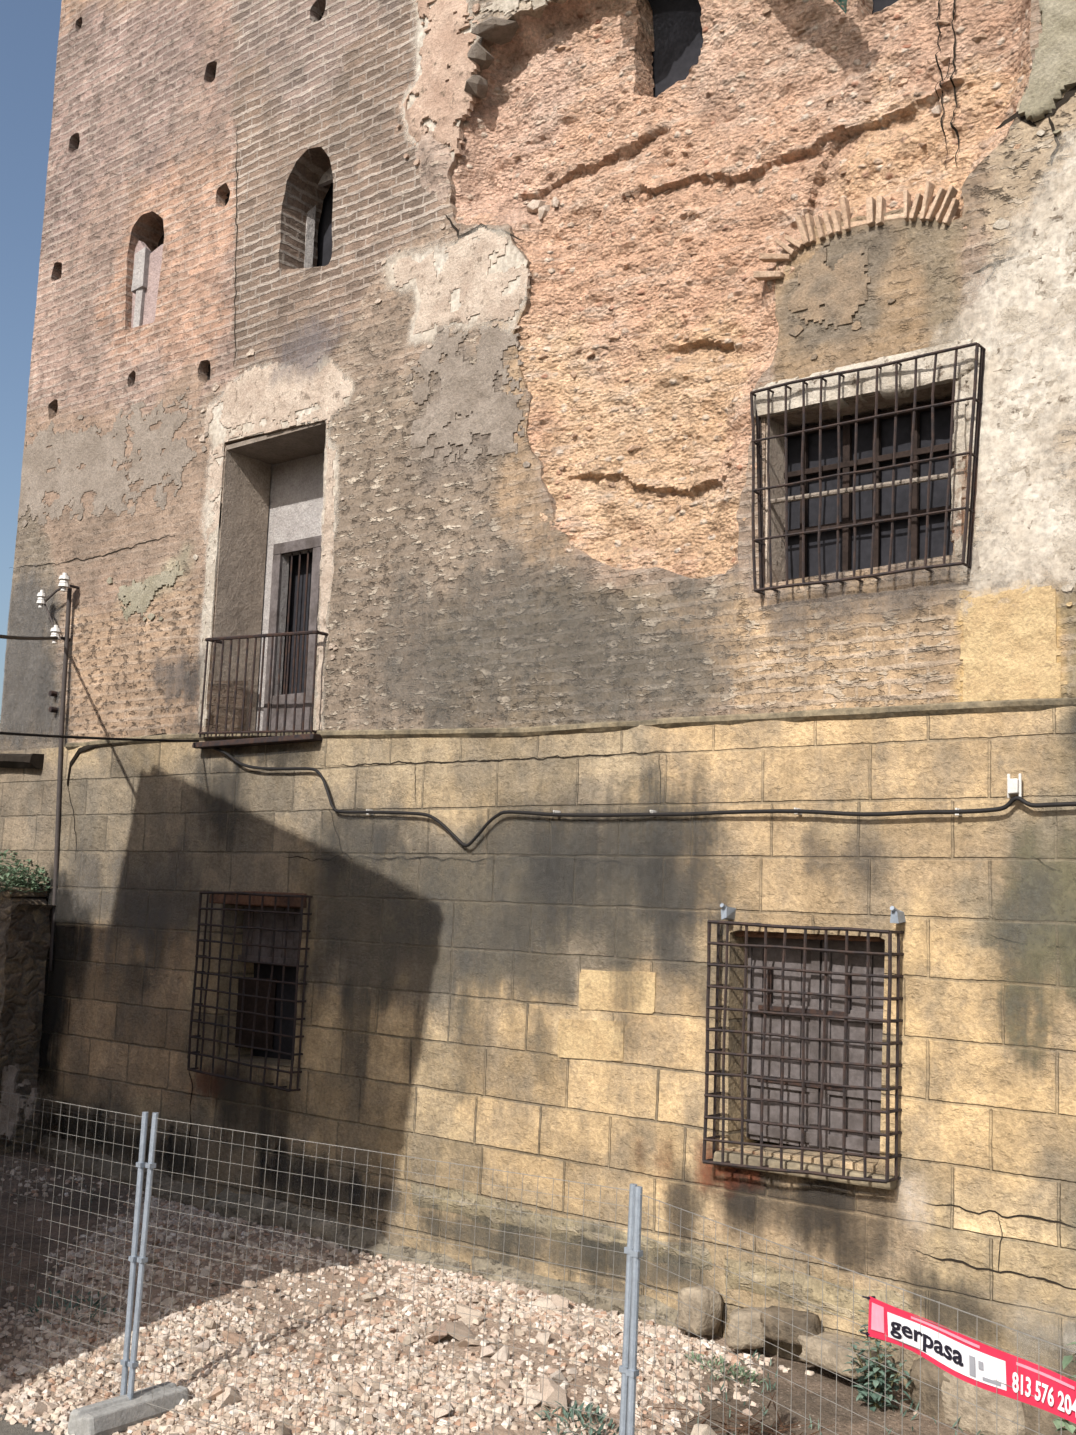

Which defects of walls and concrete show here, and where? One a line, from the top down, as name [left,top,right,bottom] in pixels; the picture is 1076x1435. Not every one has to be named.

crack [935,0,959,168]
crack [996,86,1076,165]
spalling [381,0,1076,702]
water stain [45,1107,193,1179]
water stain [257,1087,398,1207]
water stain [455,1174,698,1286]
water stain [725,1170,866,1260]
crack [916,1200,1076,1290]